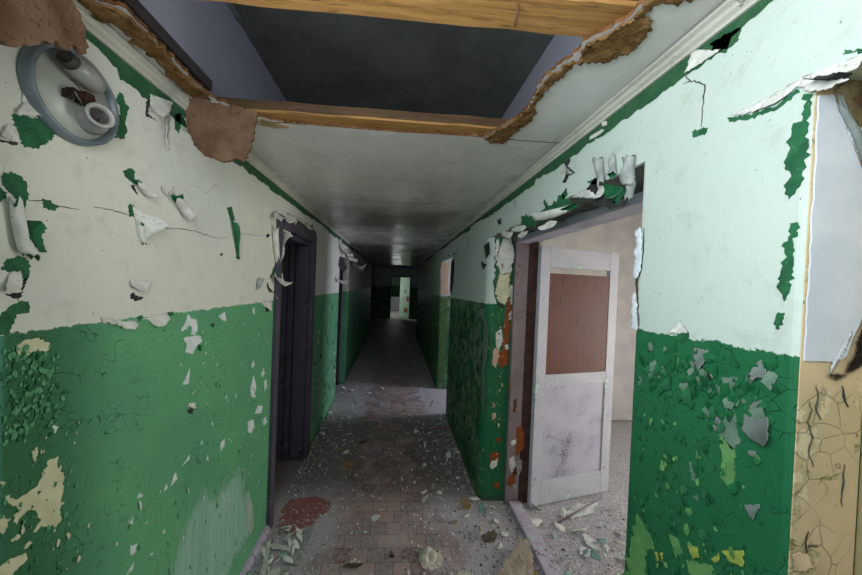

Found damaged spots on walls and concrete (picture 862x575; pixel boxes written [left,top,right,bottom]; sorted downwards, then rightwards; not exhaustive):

peeling [0,93,56,149]
peeling [86,31,188,150]
peeling [77,0,211,101]
peeling [0,163,47,335]
crack [28,200,135,217]
peeling [227,206,241,260]
peeling [233,160,372,314]
peeling [420,0,773,420]
peeling [727,48,862,373]
flaking render [181,314,202,354]
peeling [693,348,769,488]
flaking render [0,456,65,575]